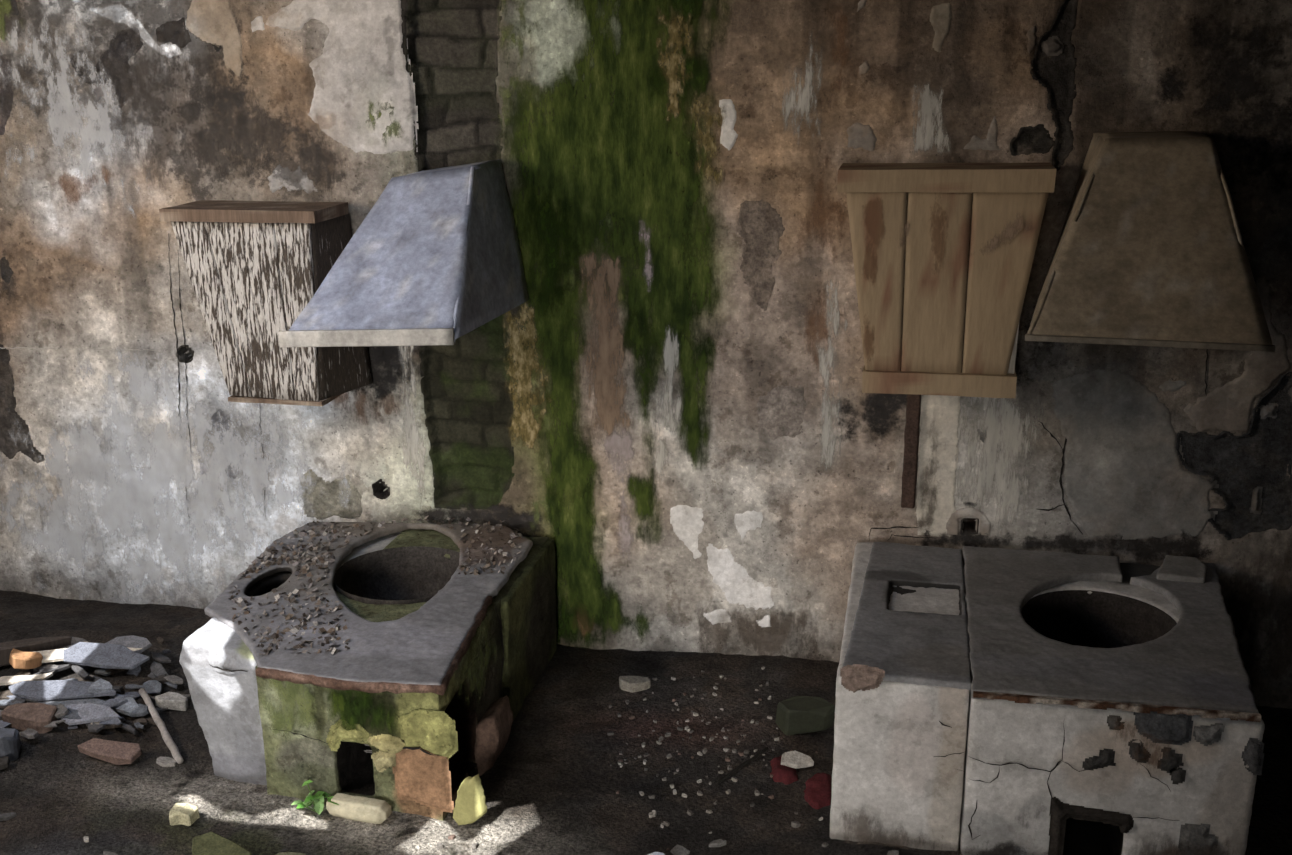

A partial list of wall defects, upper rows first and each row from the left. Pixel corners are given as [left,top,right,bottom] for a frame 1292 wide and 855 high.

water stain [0,0,344,200]
flaking render [1010,0,1079,171]
water stain [641,226,652,285]
flaking render [0,344,53,463]
water stain [522,253,819,661]
crack [1037,420,1083,534]
flaking render [1176,275,1292,540]